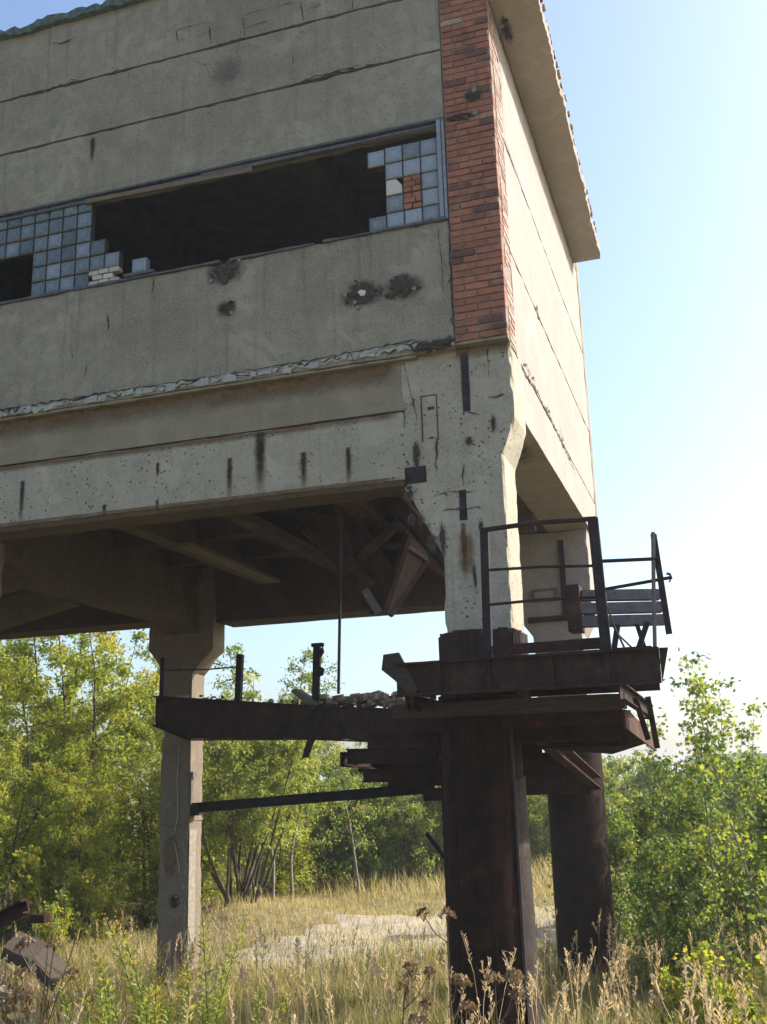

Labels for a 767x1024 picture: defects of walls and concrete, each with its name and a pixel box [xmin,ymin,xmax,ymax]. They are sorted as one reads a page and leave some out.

spalling [209,259,241,285]
spalling [218,300,234,316]
spalling [344,274,422,310]
peeling [0,335,455,417]